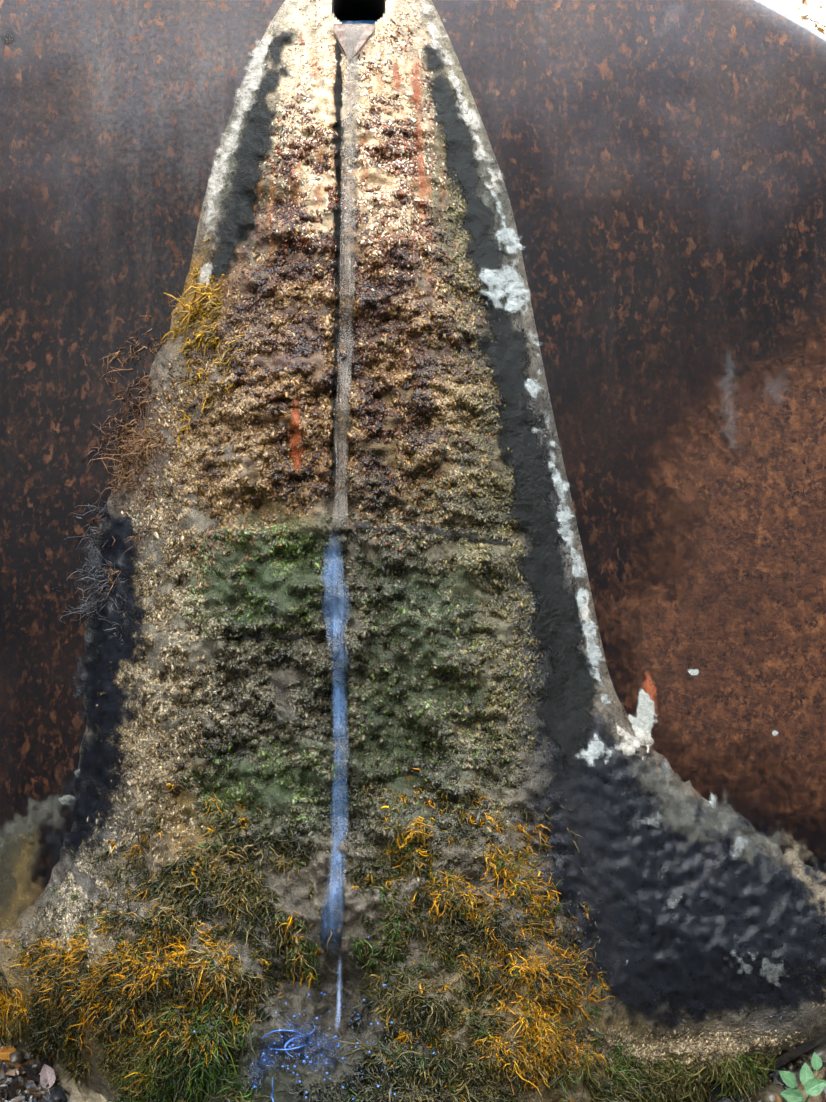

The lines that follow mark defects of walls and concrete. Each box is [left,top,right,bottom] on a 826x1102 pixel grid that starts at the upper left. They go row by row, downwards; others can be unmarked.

rust [393,59,422,107]
rust [608,331,826,817]
damp [52,986,190,1101]